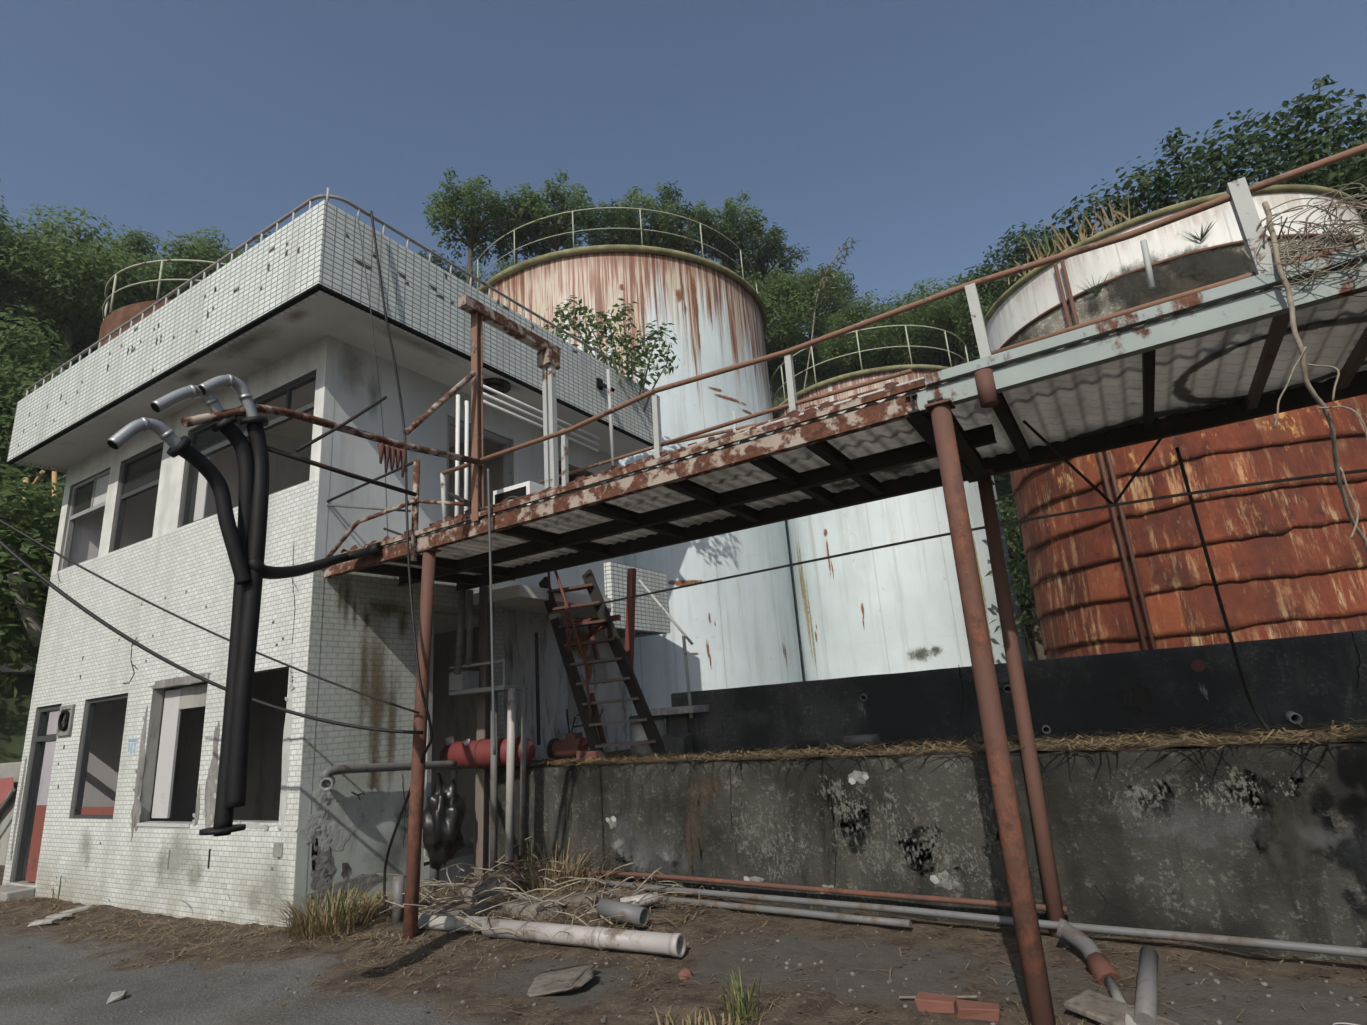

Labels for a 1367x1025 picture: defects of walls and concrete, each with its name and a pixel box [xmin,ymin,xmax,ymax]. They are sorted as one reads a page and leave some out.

rust [675,270,713,349]
rust [797,549,817,663]
spalling [149,673,212,689]
spalling [130,705,148,841]
peeling [233,637,387,910]
peeling [719,798,834,894]
peeling [815,770,1001,895]